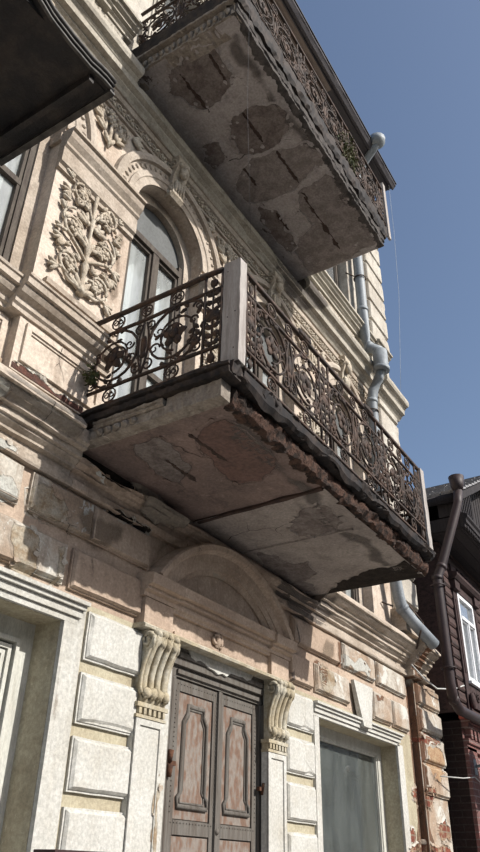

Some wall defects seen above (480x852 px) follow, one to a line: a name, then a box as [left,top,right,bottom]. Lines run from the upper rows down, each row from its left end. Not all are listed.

flaking render [164,40,238,113]
flaking render [200,100,378,275]
flaking render [0,358,84,413]
flaking render [286,502,348,538]
flaking render [410,727,446,812]
flaking render [407,817,452,852]